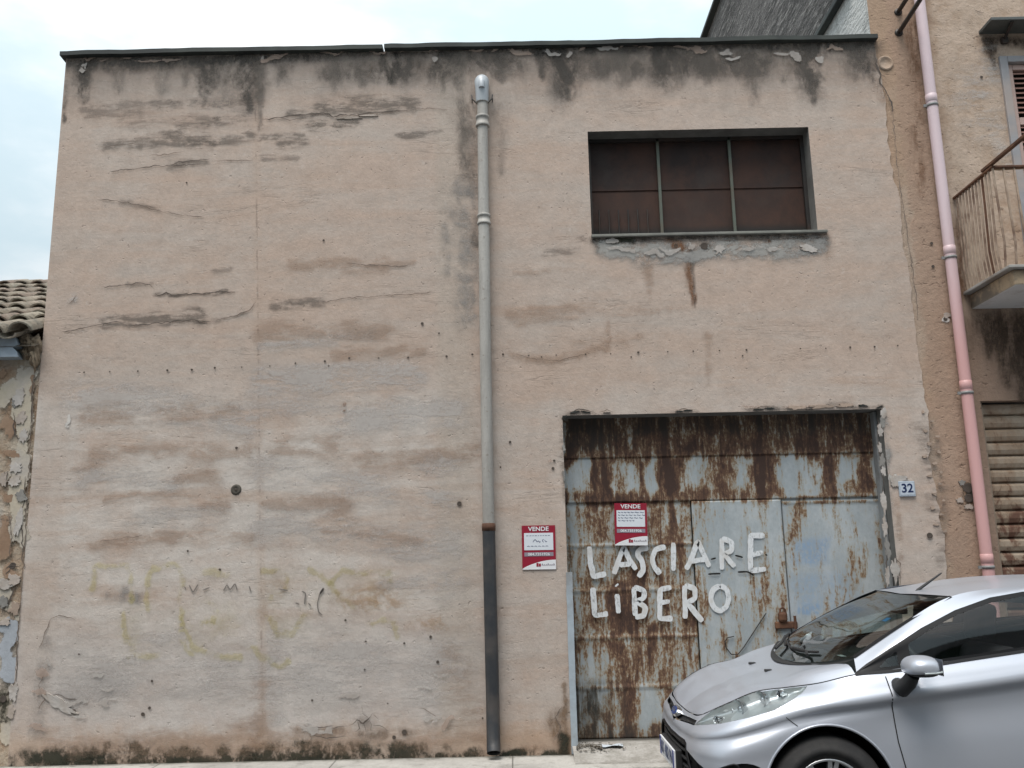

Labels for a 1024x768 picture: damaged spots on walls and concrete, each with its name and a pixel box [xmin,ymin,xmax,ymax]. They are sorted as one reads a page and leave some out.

damp [67,41,877,108]
crack [874,53,918,318]
corrosion [687,251,696,303]
spalling [598,237,827,265]
flaking render [0,365,39,626]
spalling [742,403,902,587]
spalling [0,683,19,746]
damp [8,741,484,767]